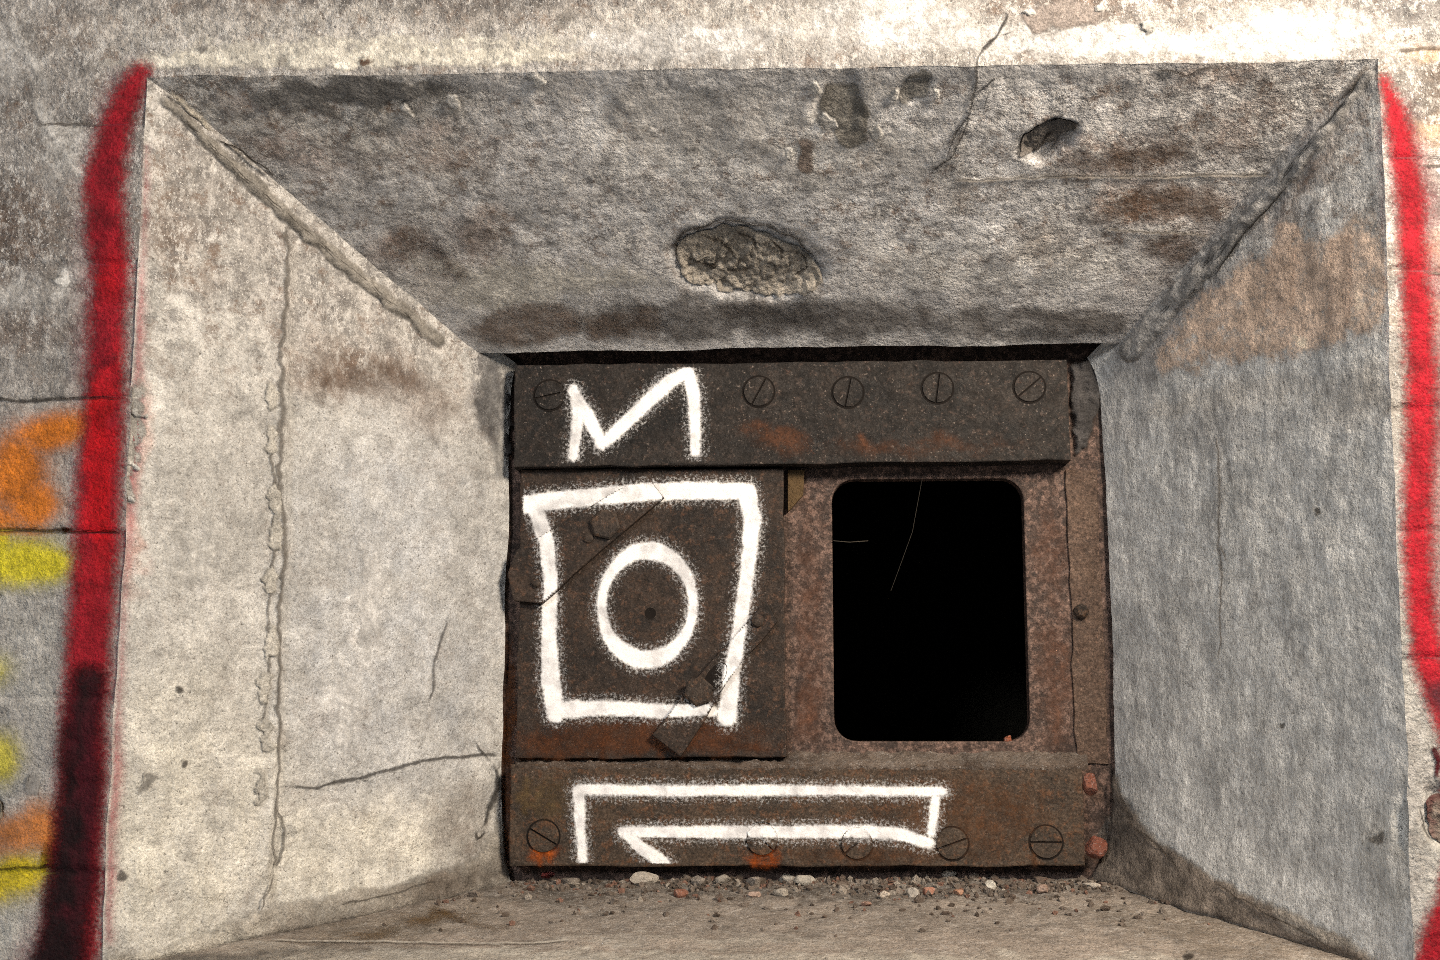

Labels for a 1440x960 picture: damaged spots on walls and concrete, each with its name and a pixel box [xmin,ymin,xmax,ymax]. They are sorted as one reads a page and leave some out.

peeling [811,81,883,148]
peeling [887,69,940,104]
crack [934,15,1010,170]
crack [1161,67,1210,77]
peeling [784,139,813,174]
spalling [674,220,822,297]
water stain [403,247,1123,346]
crack [254,231,501,866]
rust [503,666,516,737]